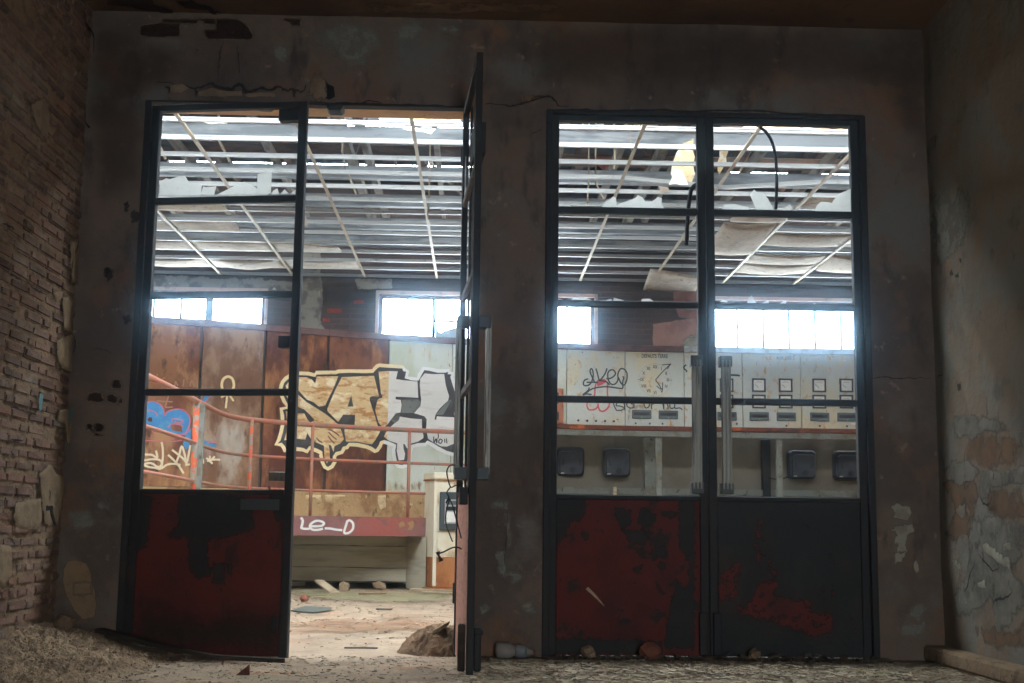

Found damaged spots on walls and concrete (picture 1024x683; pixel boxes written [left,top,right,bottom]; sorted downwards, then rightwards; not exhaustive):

spalling [139,17,254,41]
crack [156,44,444,106]
peeling [952,504,1024,633]